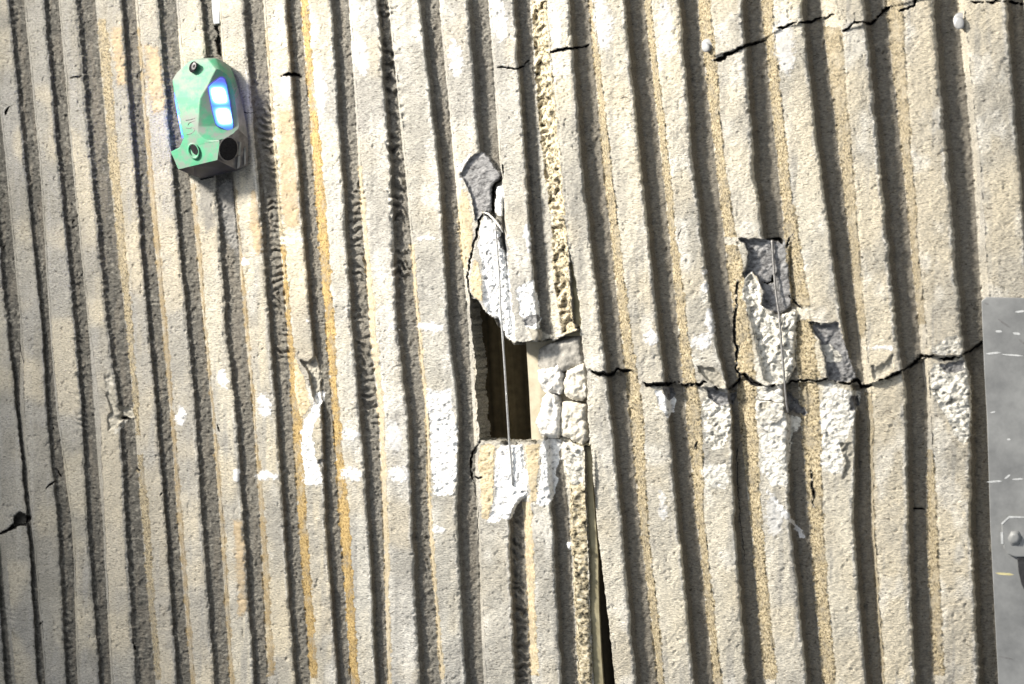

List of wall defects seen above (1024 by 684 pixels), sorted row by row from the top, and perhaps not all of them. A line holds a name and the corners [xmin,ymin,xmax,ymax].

crack [498,44,590,70]
crack [714,0,916,61]
crack [974,0,1024,8]
spalling [456,152,553,341]
crack [592,282,983,403]
spalling [739,237,861,487]
spalling [486,438,584,523]